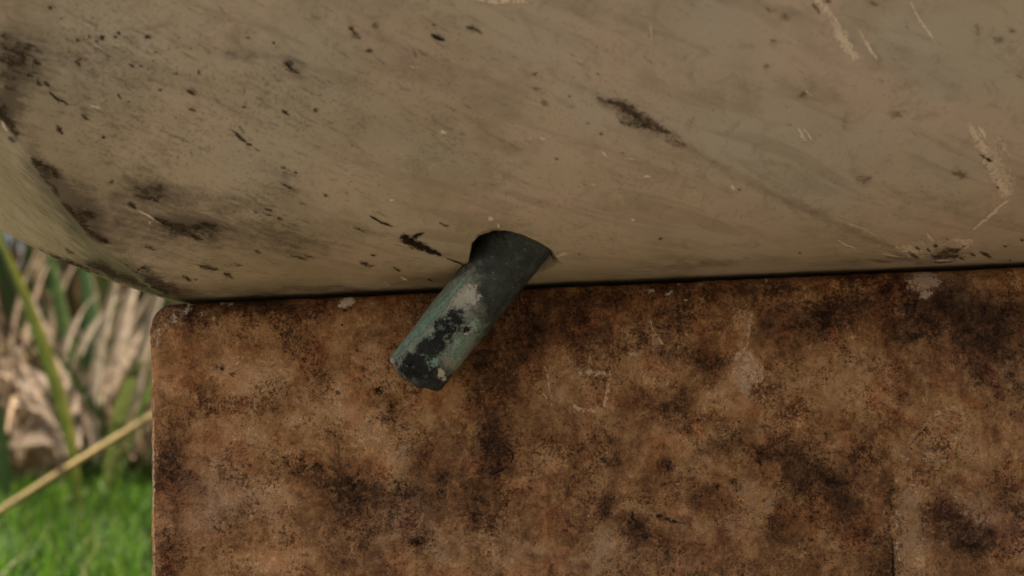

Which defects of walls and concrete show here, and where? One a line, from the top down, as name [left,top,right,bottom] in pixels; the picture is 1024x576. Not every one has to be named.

leakage [0,34,49,142]
leakage [599,98,685,146]
leakage [30,157,109,244]
leakage [128,181,219,241]
leakage [39,249,240,297]
leakage [446,283,482,335]
leakage [906,272,941,299]
leakage [731,313,764,393]
leakage [570,369,612,414]